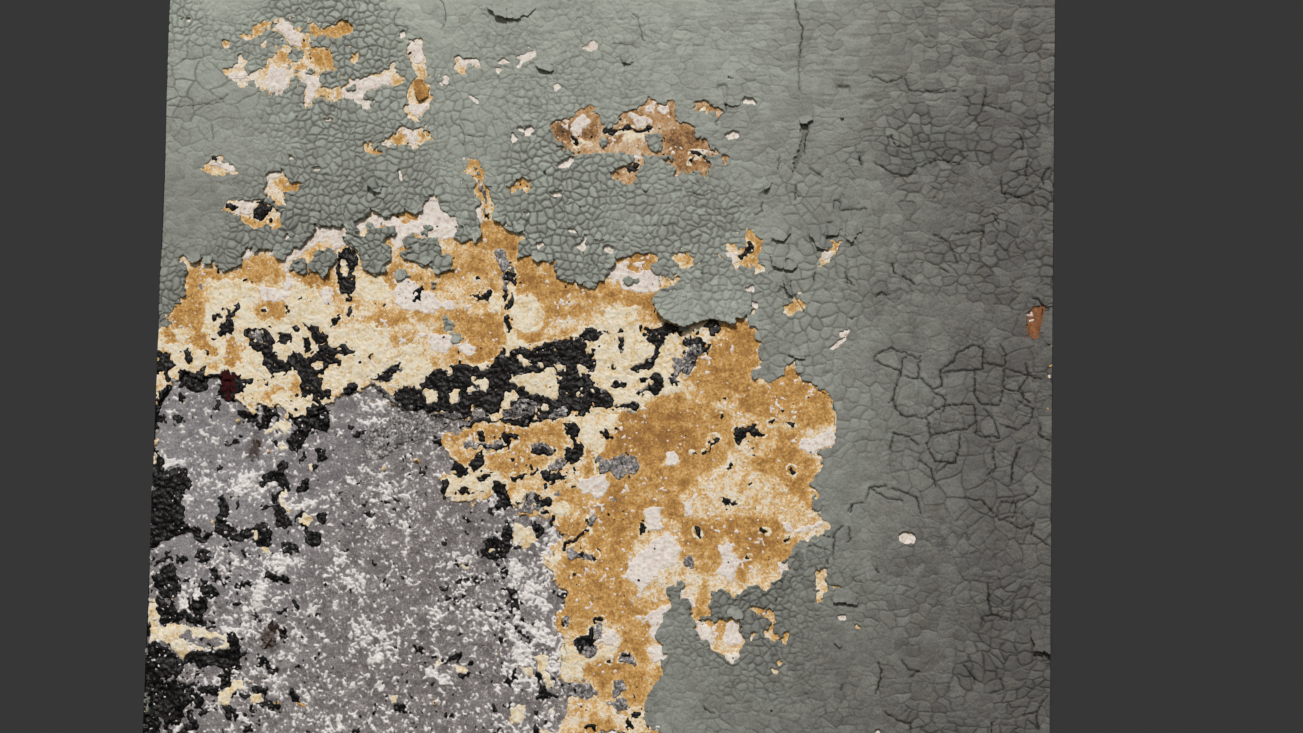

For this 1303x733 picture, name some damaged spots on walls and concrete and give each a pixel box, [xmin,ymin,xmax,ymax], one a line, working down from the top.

peeling [582,40,598,51]
peeling [222,16,561,155]
peeling [550,97,739,185]
peeling [809,222,843,267]
crack [777,123,1050,297]
peeling [830,329,850,350]
peeling [1038,307,1052,348]
peeling [143,152,837,733]
crack [815,345,1050,563]
peeling [815,568,860,629]
crack [876,662,920,732]